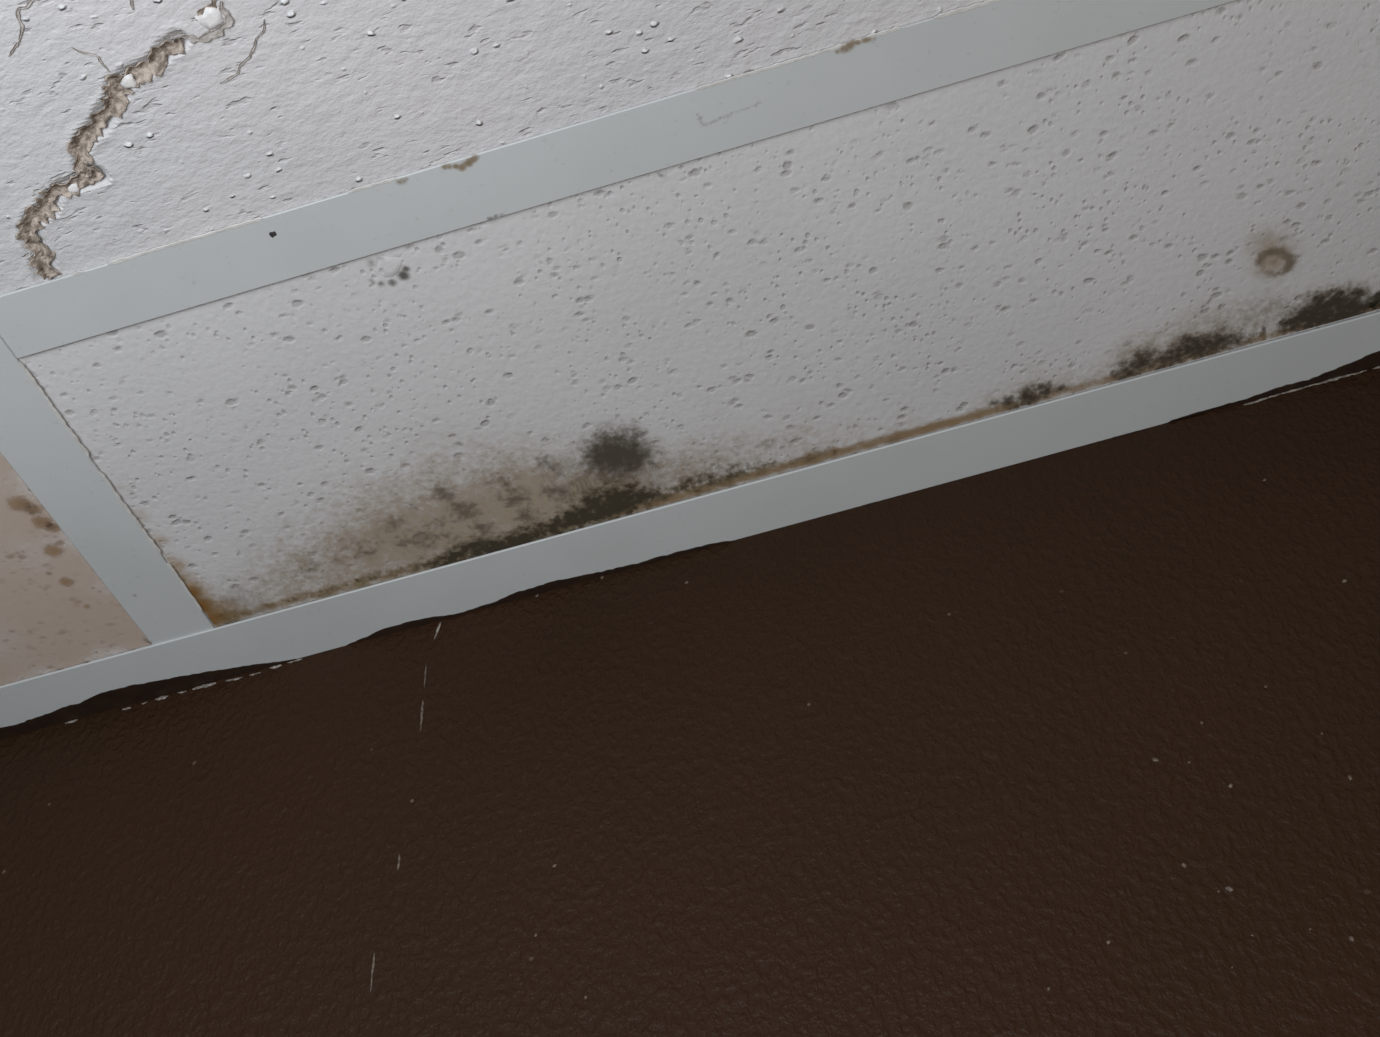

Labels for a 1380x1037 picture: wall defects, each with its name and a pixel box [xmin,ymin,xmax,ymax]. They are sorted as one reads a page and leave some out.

crack [9,0,38,56]
crack [15,0,265,281]
damp [1258,244,1295,273]
damp [218,288,1380,622]
damp [0,456,151,686]